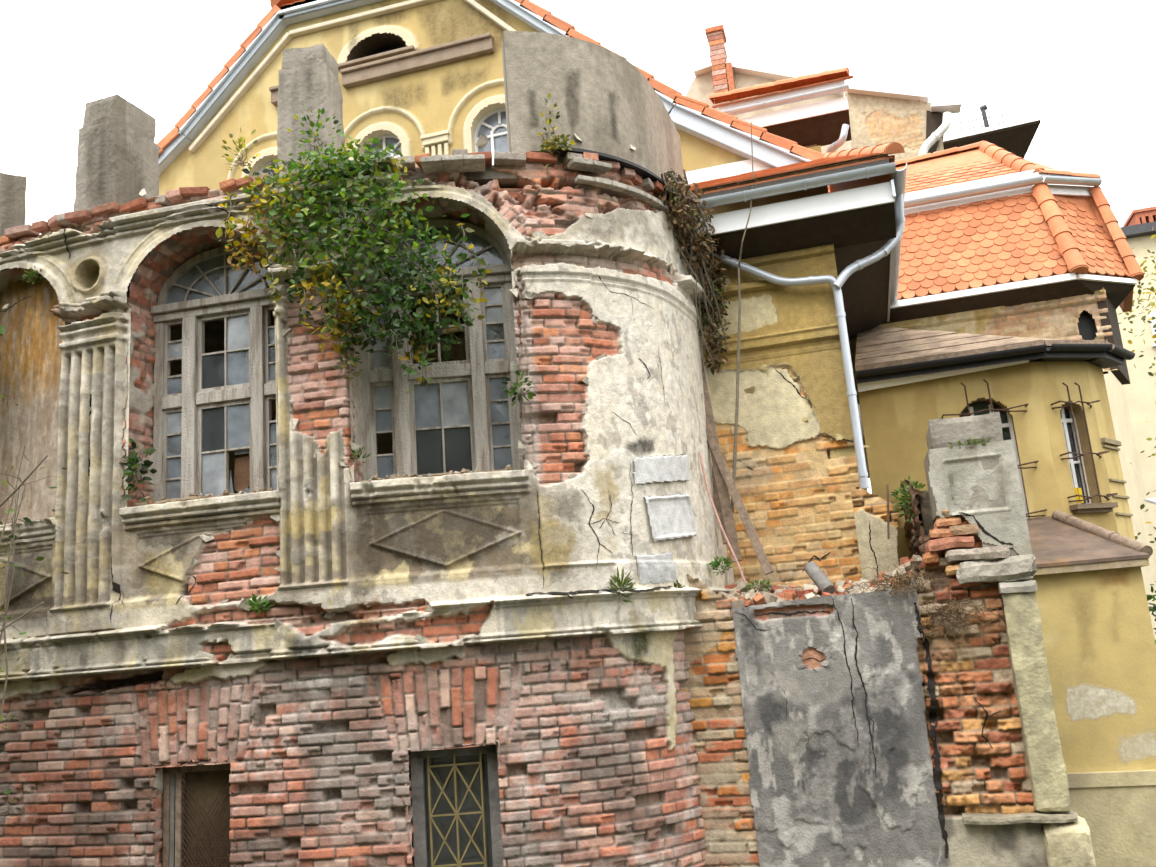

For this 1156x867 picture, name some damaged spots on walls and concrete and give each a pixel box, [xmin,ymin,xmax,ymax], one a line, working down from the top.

flaking render [476,135,489,148]
flaking render [282,263,363,468]
flaking render [398,163,689,486]
flaking render [163,513,495,645]
crack [525,464,677,599]
flaking render [705,363,899,588]
crack [869,524,878,578]
flaking render [195,637,236,661]
crack [735,598,877,779]
flaking render [798,646,829,671]